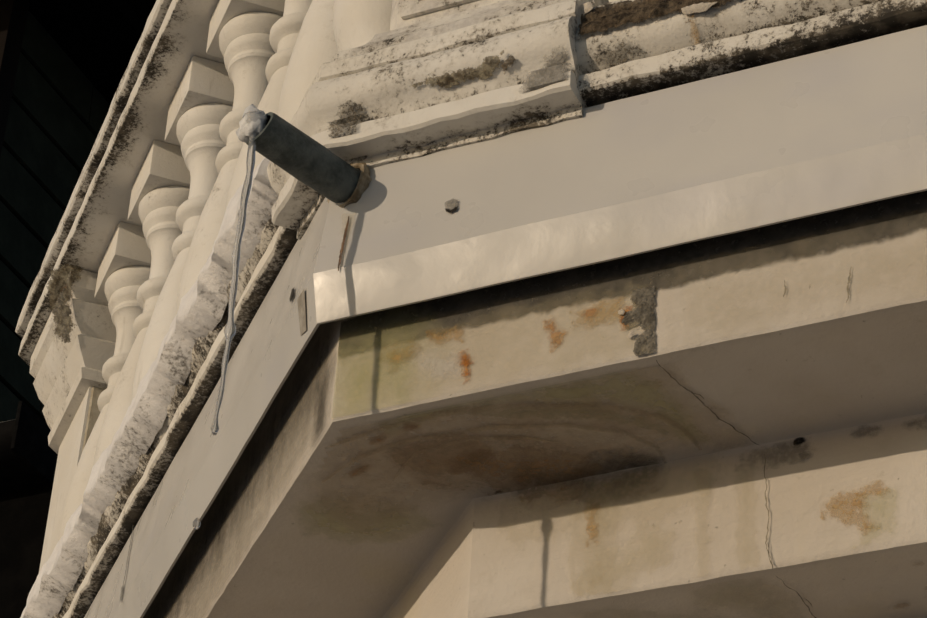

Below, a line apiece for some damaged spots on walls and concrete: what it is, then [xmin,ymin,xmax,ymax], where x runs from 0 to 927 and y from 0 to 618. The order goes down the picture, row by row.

spalling [578,0,731,38]
rust [338,216,349,271]
spalling [618,286,656,356]
rust [460,351,471,377]
leakage [341,383,679,514]
crack [656,360,816,618]